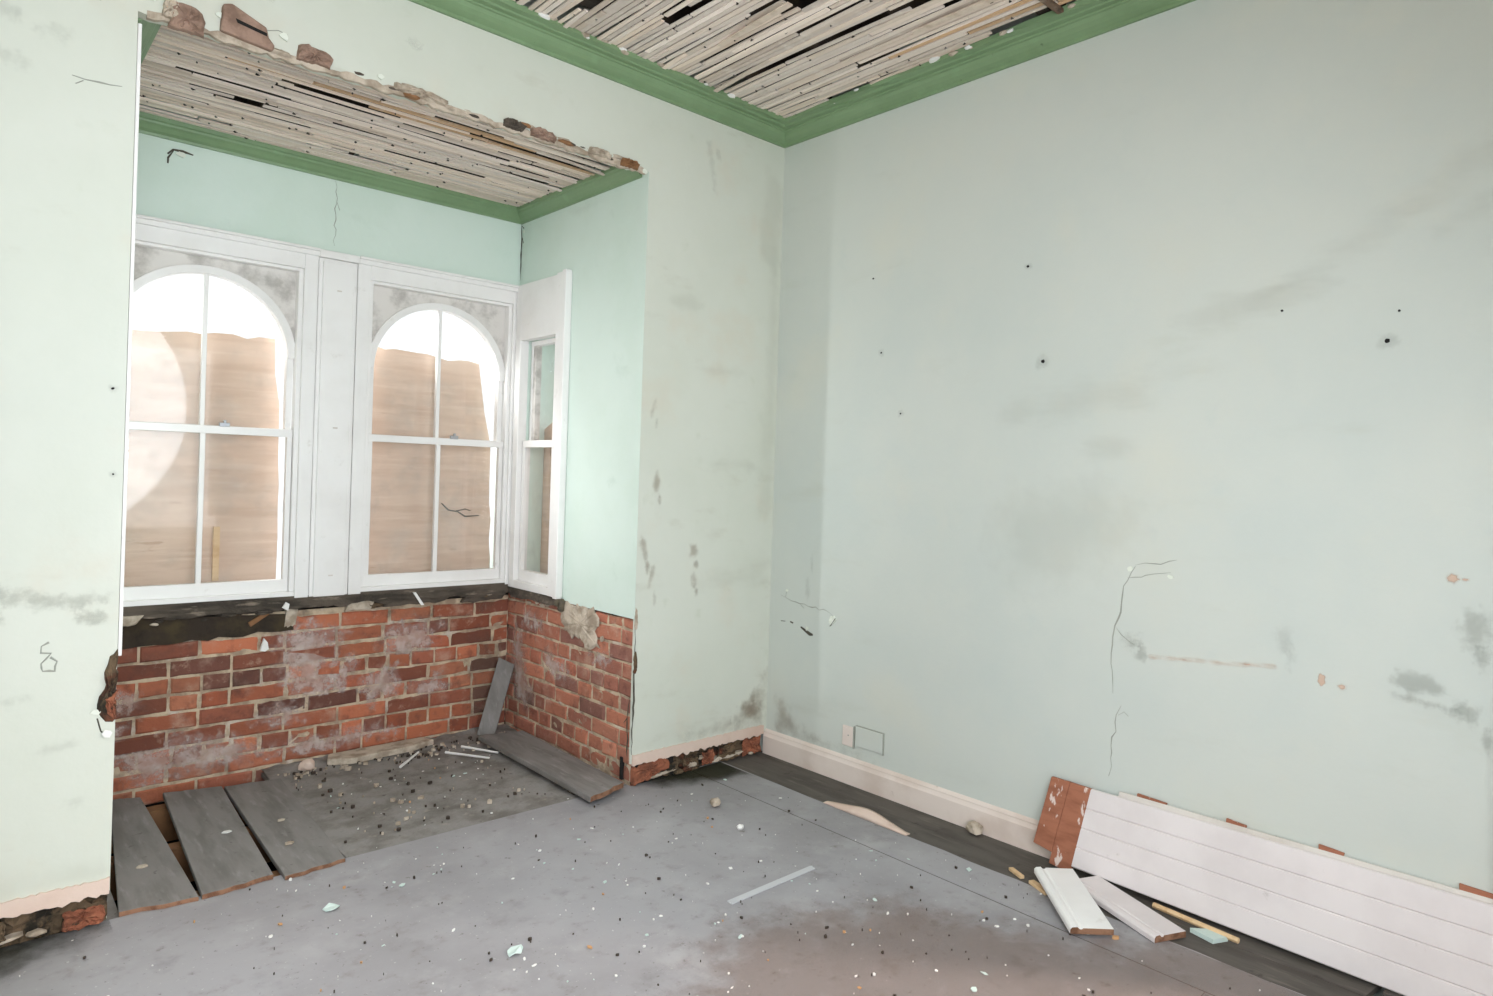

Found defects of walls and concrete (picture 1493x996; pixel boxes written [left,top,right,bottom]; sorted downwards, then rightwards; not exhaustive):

flaking render [146,0,648,175]
spalling [619,609,764,786]
crack [1109,560,1175,774]
spalling [0,876,110,948]